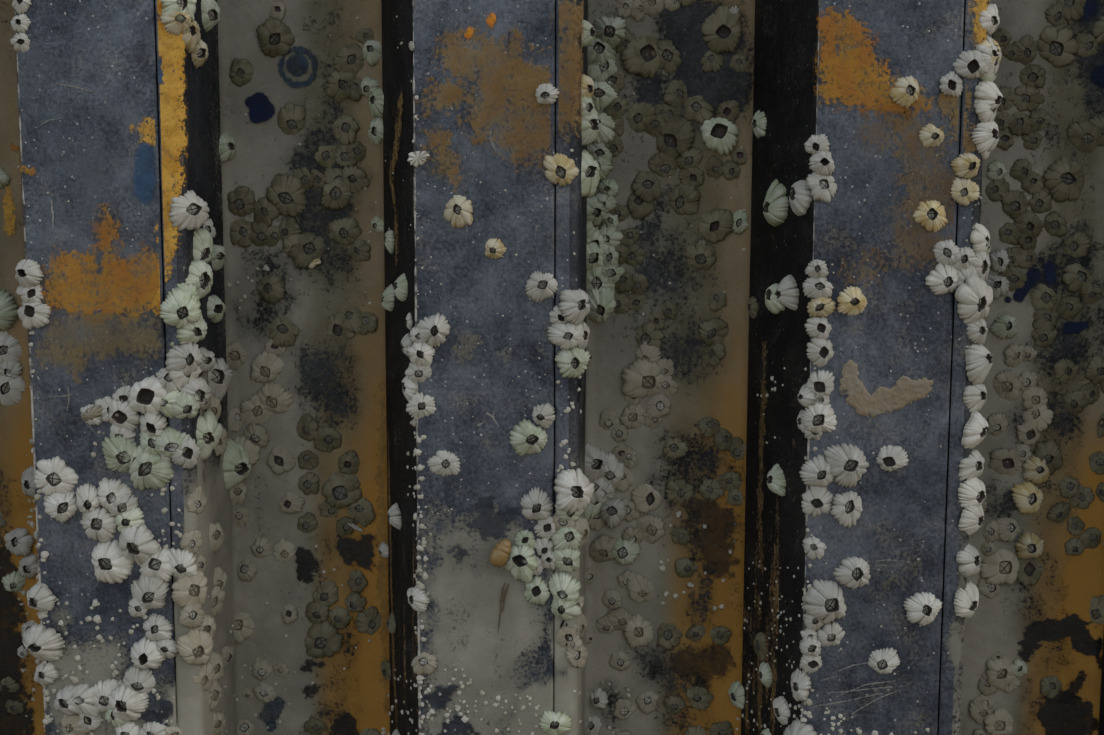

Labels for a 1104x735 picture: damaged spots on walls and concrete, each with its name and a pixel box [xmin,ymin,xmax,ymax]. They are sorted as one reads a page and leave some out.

corrosion [812,6,976,153]
corrosion [40,0,188,328]
peeling [467,496,520,541]
peeling [447,544,469,564]
peeling [140,700,173,727]
peeling [424,684,480,735]